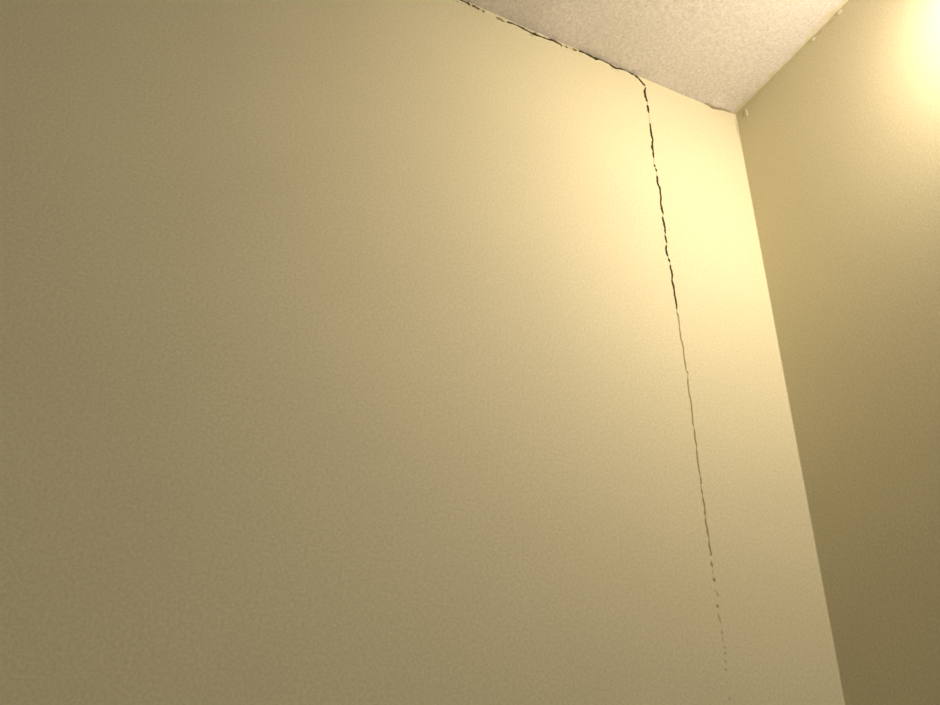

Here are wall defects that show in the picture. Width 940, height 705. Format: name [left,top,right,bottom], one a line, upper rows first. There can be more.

crack [454,0,731,700]